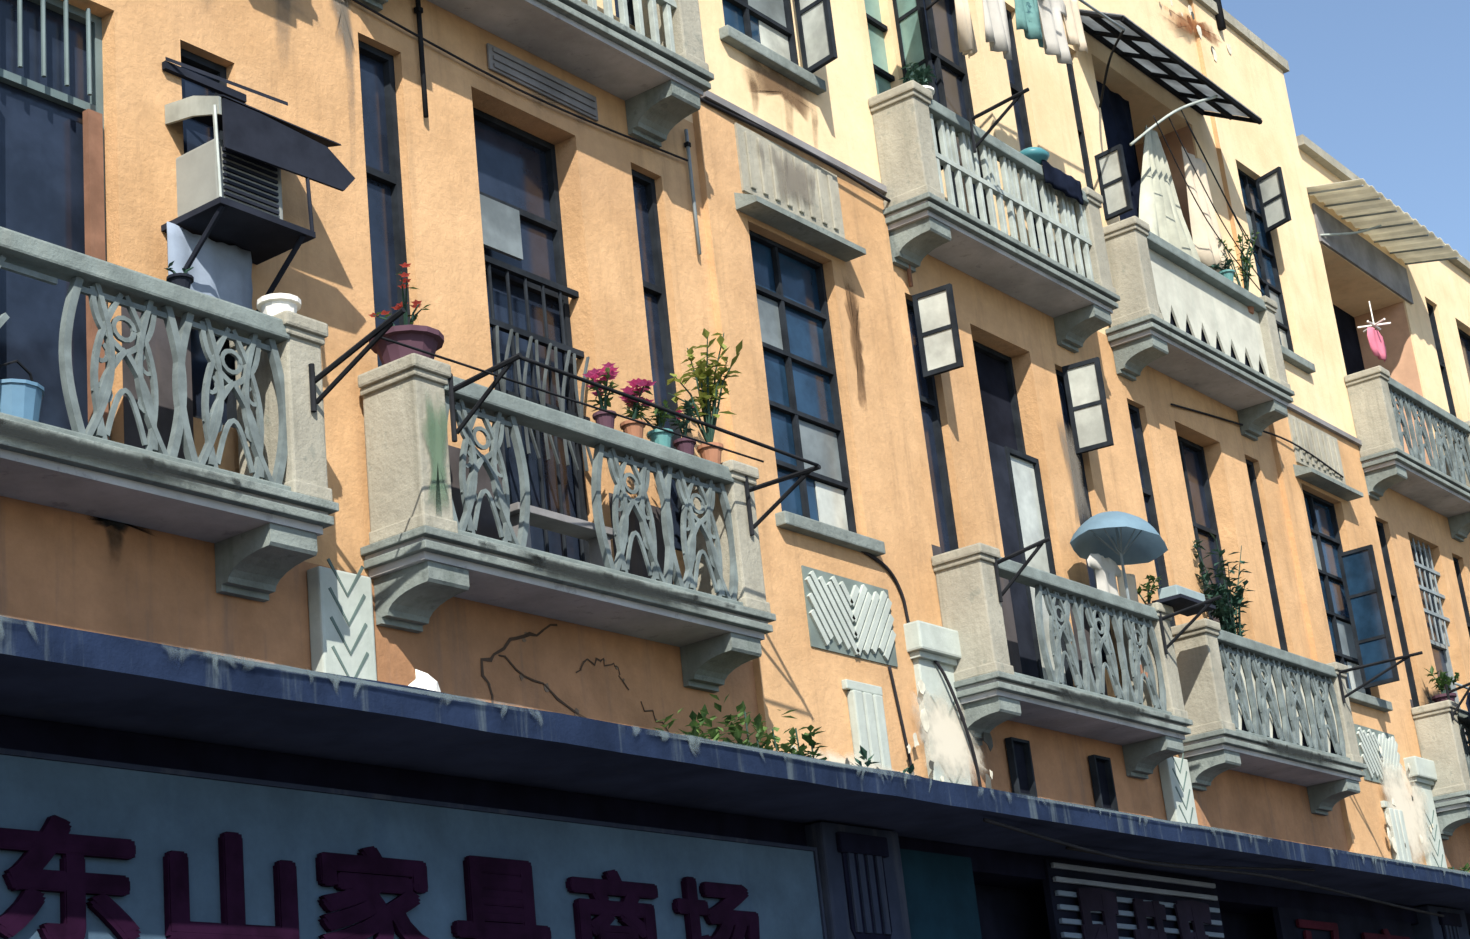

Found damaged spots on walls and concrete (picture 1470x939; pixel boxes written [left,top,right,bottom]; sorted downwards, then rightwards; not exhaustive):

damp [208,653,505,708]
crack [480,624,670,733]